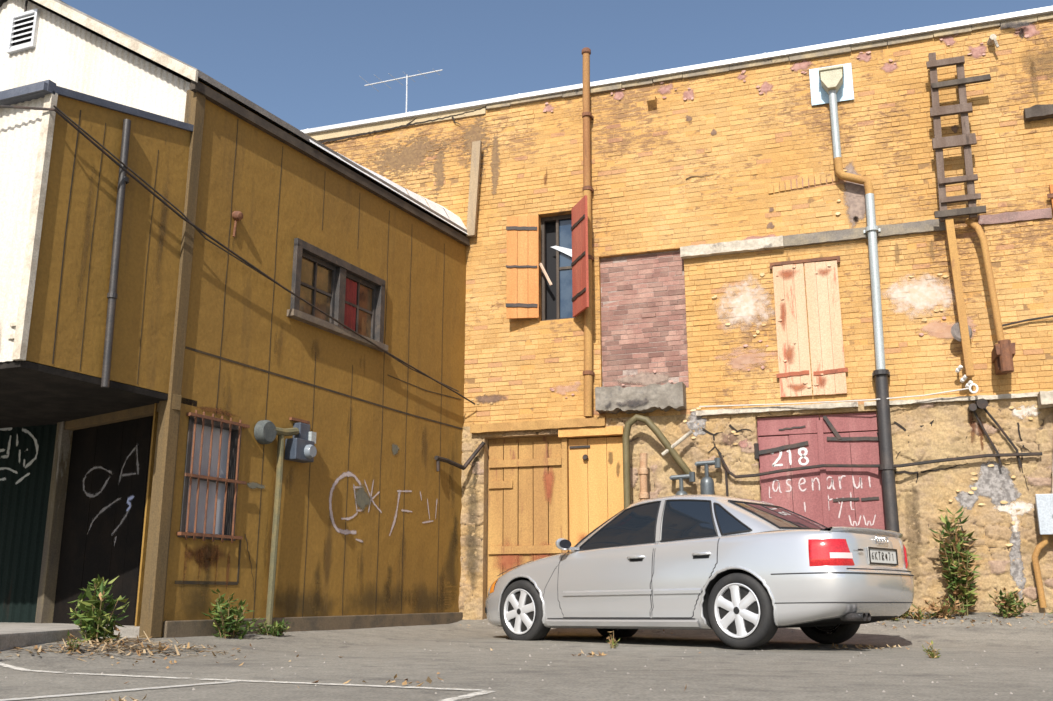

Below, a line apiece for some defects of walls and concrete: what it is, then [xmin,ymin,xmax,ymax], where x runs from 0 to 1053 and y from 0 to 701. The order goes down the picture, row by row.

peeling [712,273,774,371]
peeling [887,273,955,338]
leakage [994,501,1032,537]
corrosion [183,544,230,589]